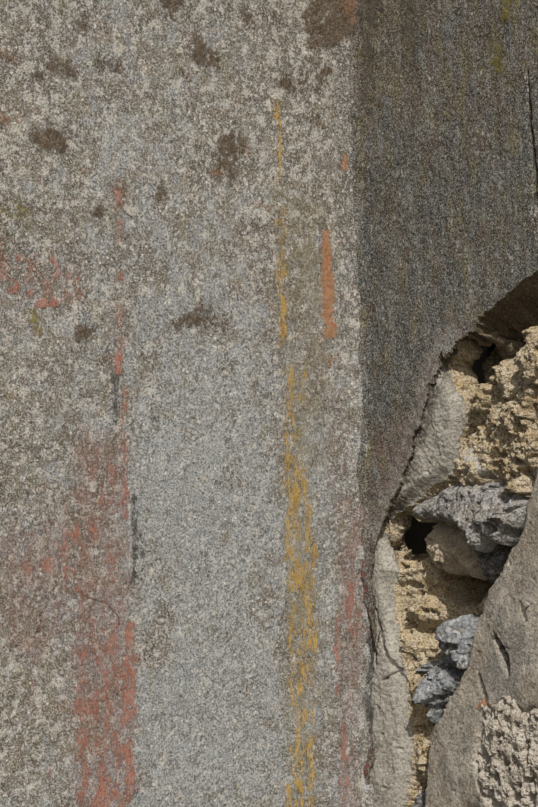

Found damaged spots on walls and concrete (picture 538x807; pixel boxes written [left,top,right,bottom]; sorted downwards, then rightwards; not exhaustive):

leakage [277,0,376,106]
crack [528,78,538,221]
spalling [367,270,538,807]